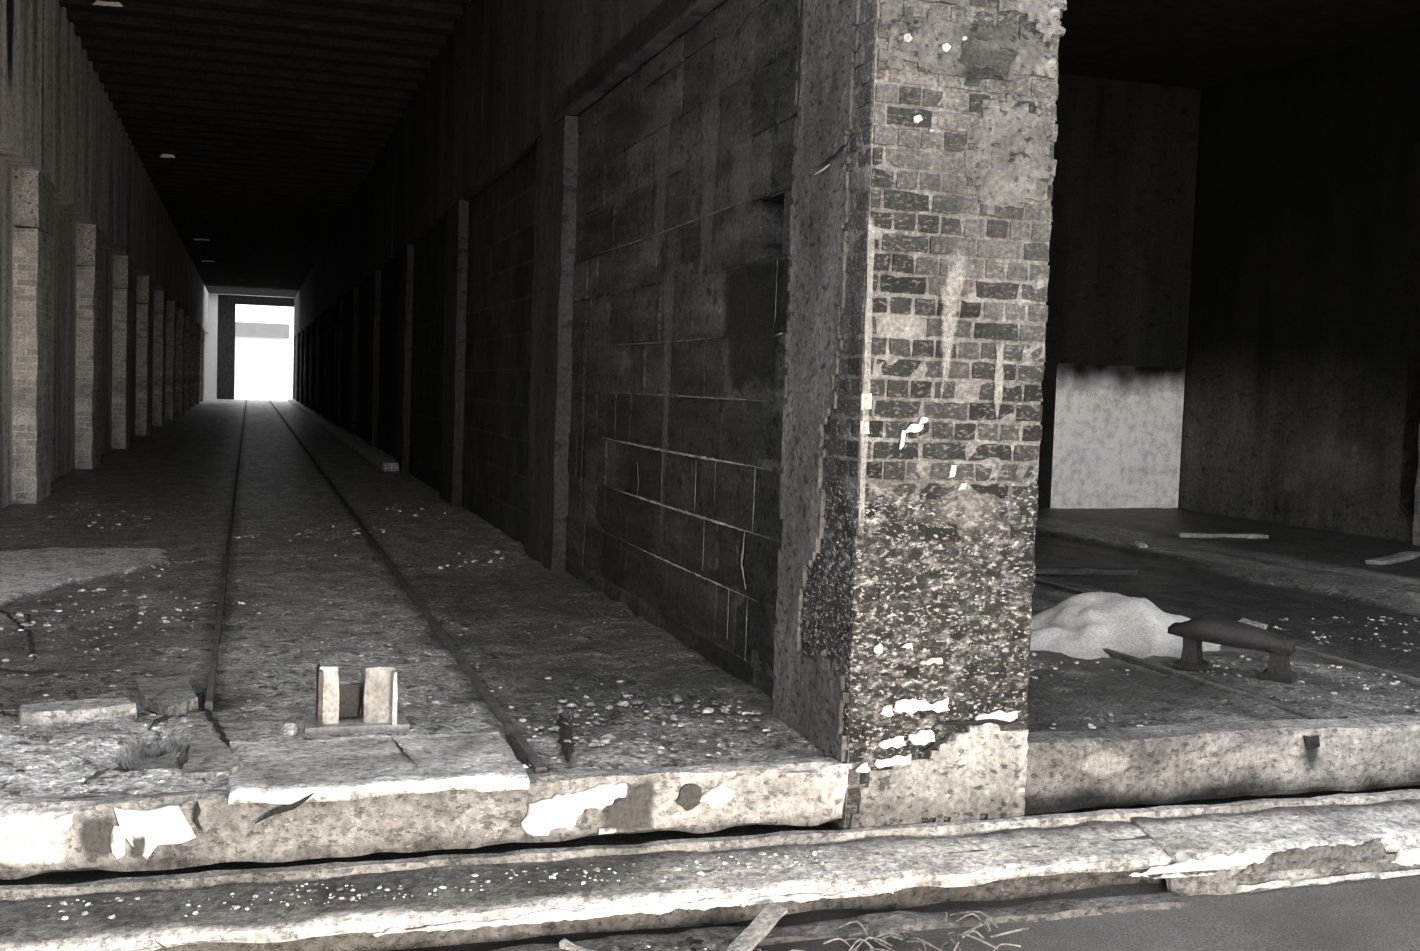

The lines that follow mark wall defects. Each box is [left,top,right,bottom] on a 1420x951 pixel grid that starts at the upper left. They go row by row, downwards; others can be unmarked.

spalling [942,36,1018,75]
spalling [901,643,943,665]
spalling [880,697,949,717]
spalling [975,710,1018,722]
spalling [855,729,935,773]
peeling [521,782,629,836]
spalling [676,783,735,811]
peeling [0,813,74,866]
peeling [111,805,196,859]